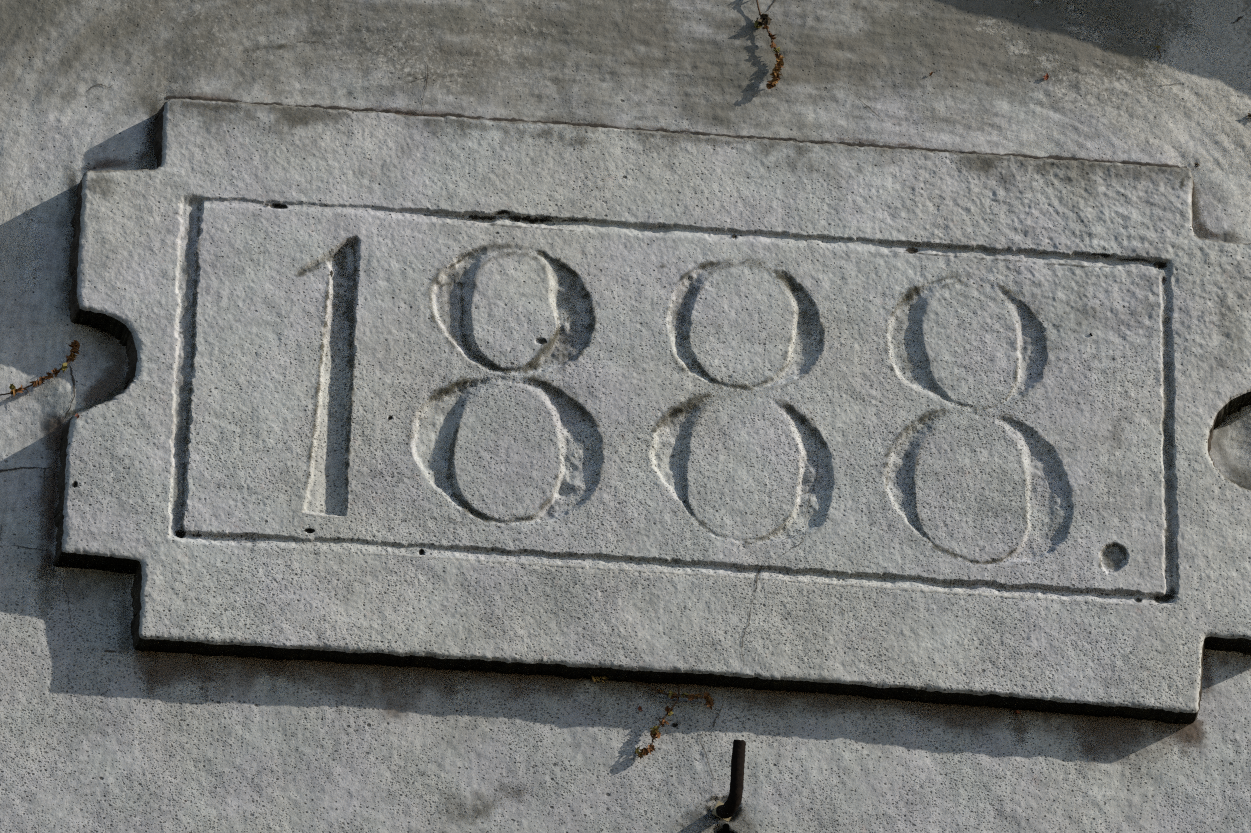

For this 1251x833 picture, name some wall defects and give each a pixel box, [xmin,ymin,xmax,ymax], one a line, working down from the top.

crack [0,467,58,491]
crack [699,435,819,787]